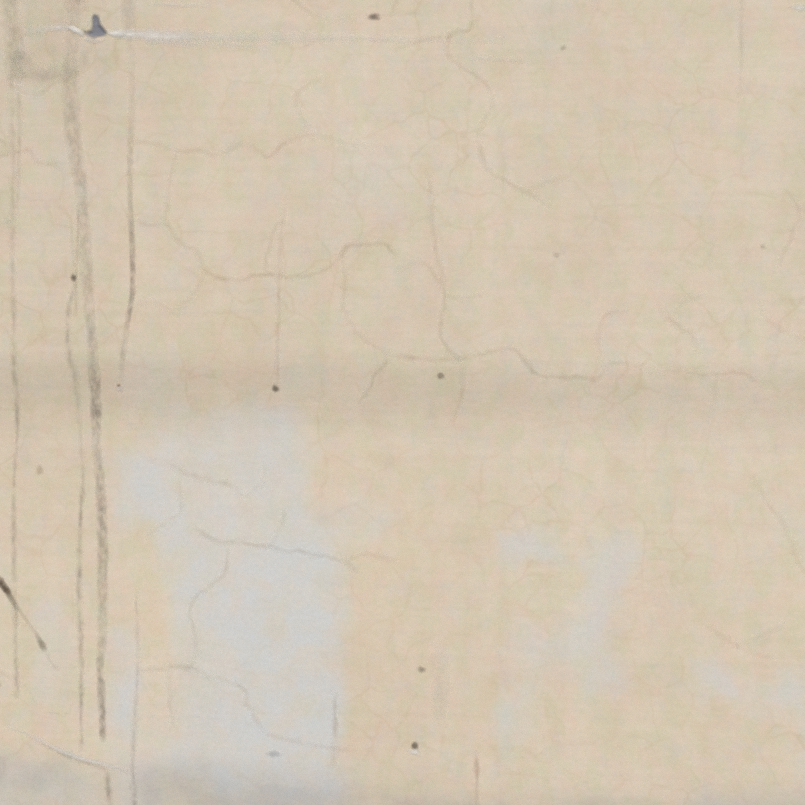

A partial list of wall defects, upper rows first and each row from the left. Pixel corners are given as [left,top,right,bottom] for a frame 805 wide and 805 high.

crack [0,580,10,594]
water stain [0,410,92,625]